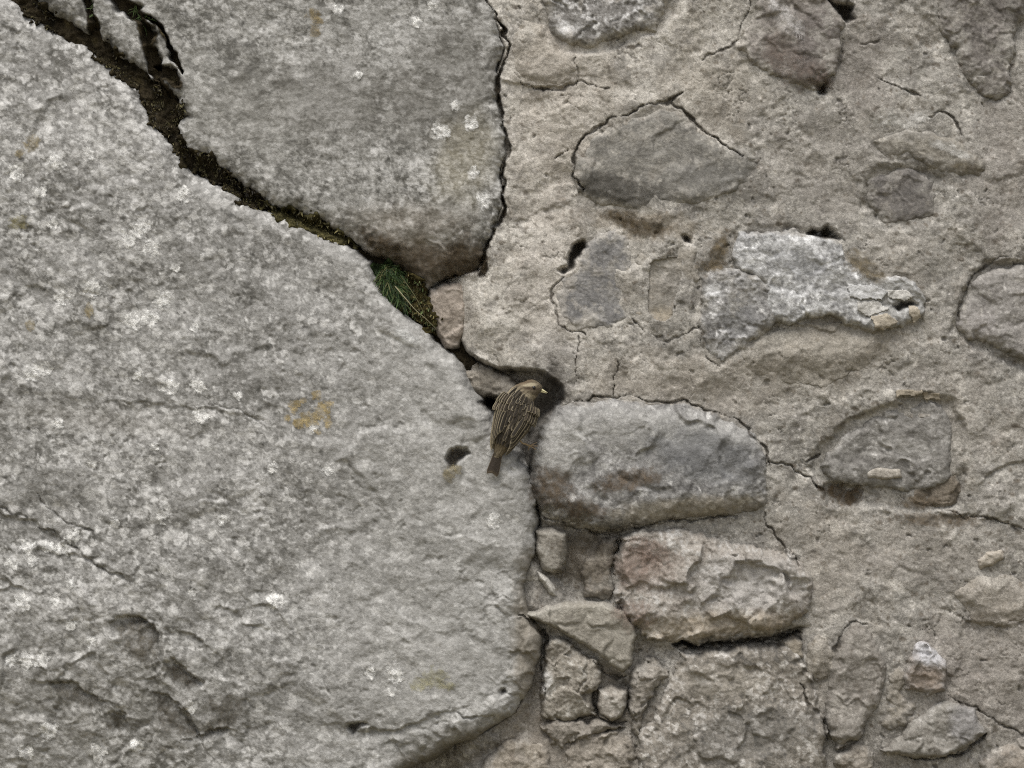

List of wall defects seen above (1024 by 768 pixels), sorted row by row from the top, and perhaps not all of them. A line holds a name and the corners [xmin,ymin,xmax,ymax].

crack [498,22,507,41]
crack [11,0,290,213]
crack [494,70,504,116]
crack [666,94,719,141]
crack [478,142,510,277]
crack [333,230,405,278]
crack [406,312,476,370]